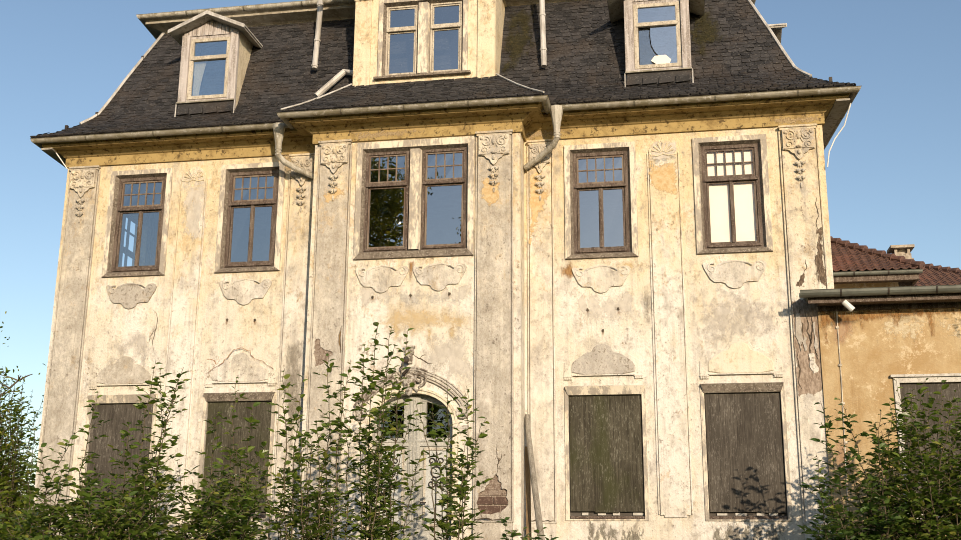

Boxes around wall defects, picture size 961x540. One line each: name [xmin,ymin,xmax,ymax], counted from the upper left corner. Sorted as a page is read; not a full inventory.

peeling [648,142,679,198]
spalling [796,198,827,287]
flaking render [314,332,341,372]
leakage [389,310,463,337]
flaking render [792,299,823,396]
flaking render [477,473,512,515]